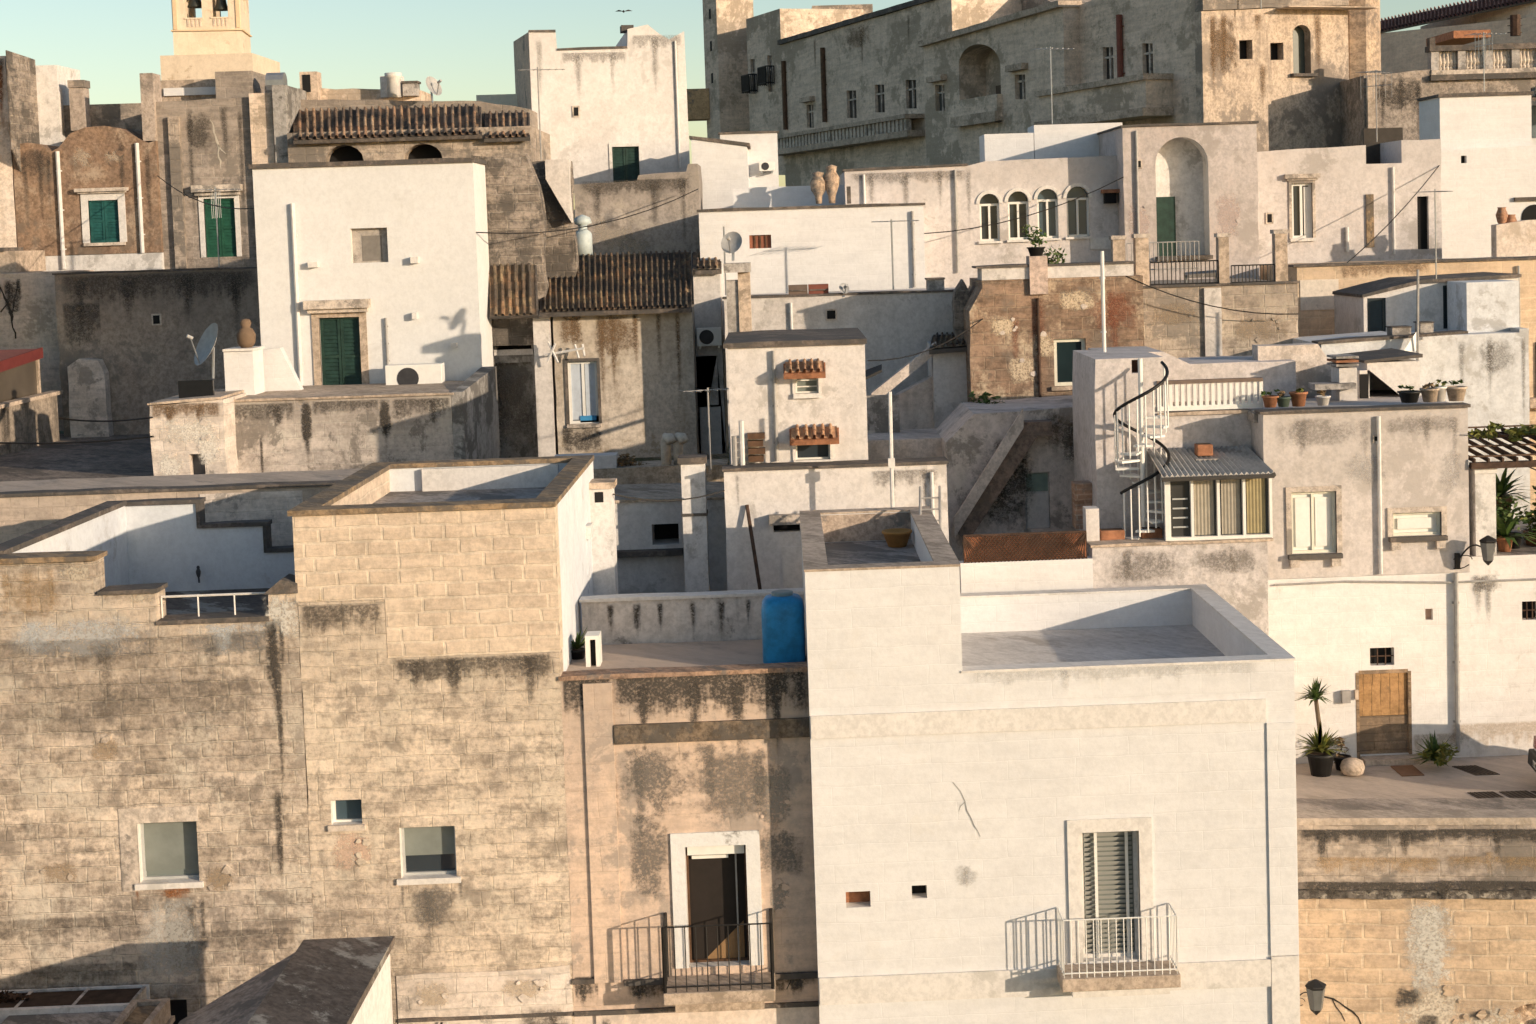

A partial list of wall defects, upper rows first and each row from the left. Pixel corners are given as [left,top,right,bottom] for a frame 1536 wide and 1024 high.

crack [0,285,18,339]
leakage [20,622,134,655]
leakage [203,597,379,771]
leakage [398,655,549,691]
leakage [564,672,807,724]
leakage [275,796,283,869]
leakage [627,746,802,894]
crack [953,783,980,836]
spalling [1399,985,1536,1024]